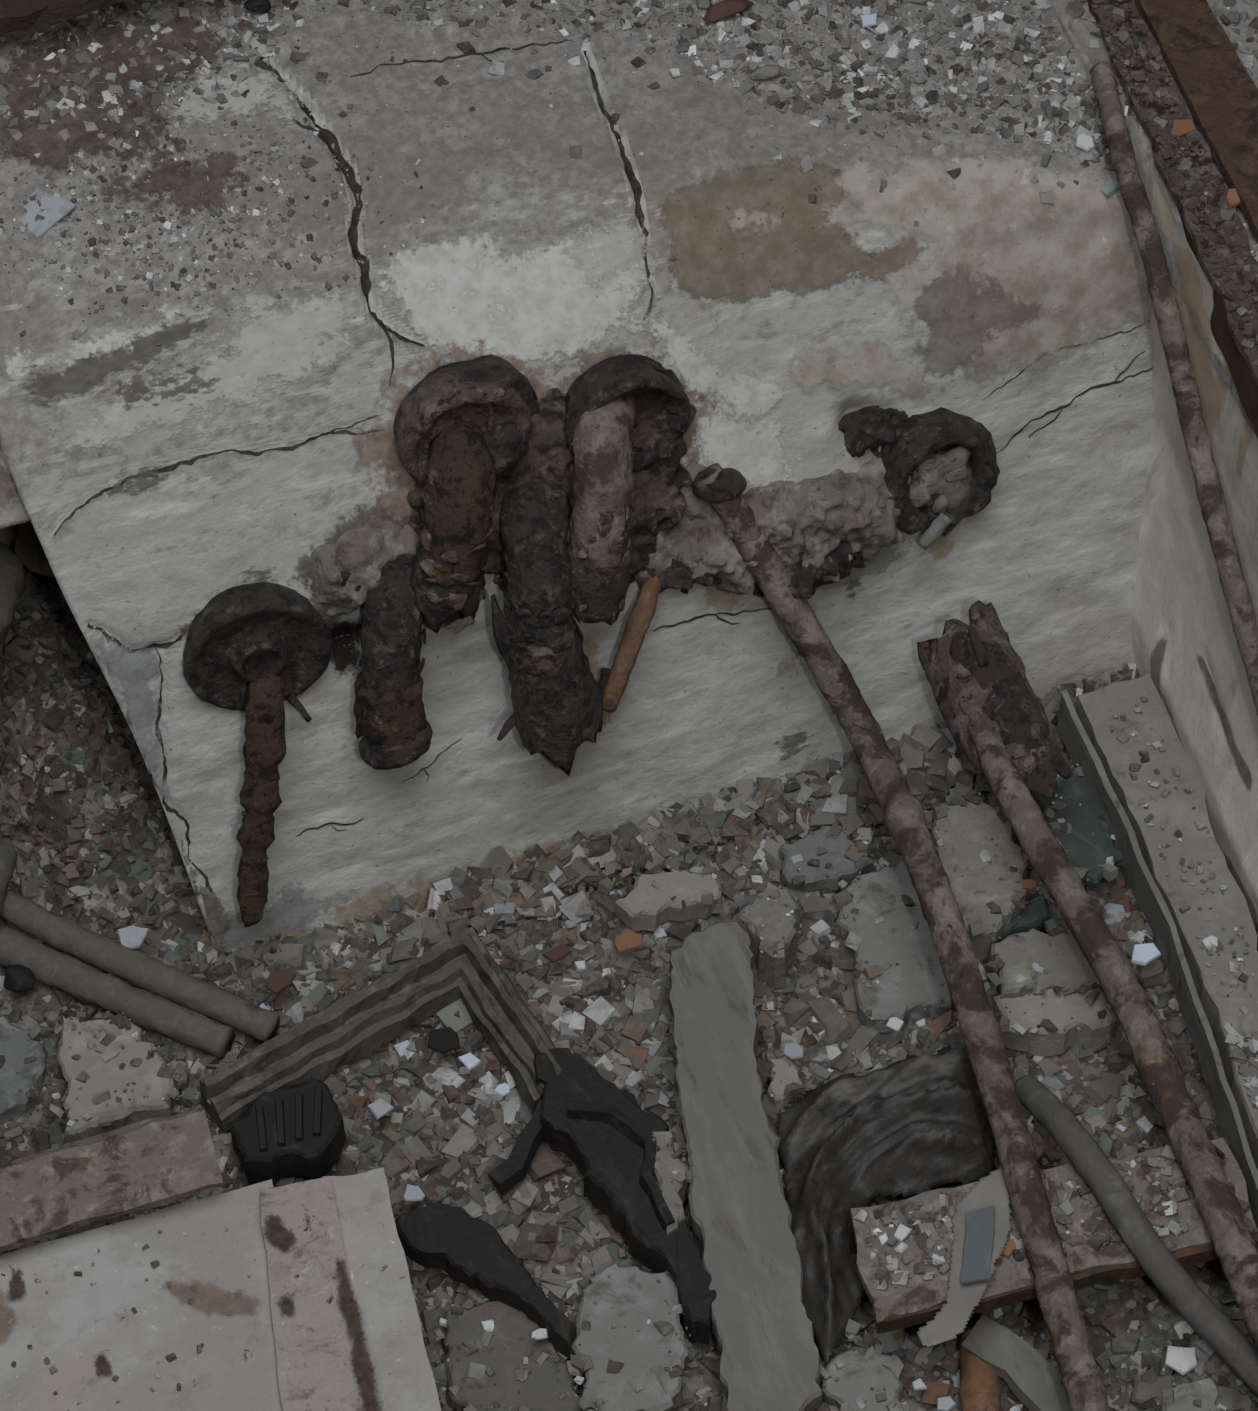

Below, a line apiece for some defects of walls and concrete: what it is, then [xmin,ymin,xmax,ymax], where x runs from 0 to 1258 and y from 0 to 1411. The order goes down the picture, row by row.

crack [350,40,654,321]
crack [54,47,424,535]
corrosion [353,340,484,524]
corrosion [499,347,663,402]
corrosion [674,372,715,468]
leakage [790,266,1040,400]
crack [983,321,1153,453]